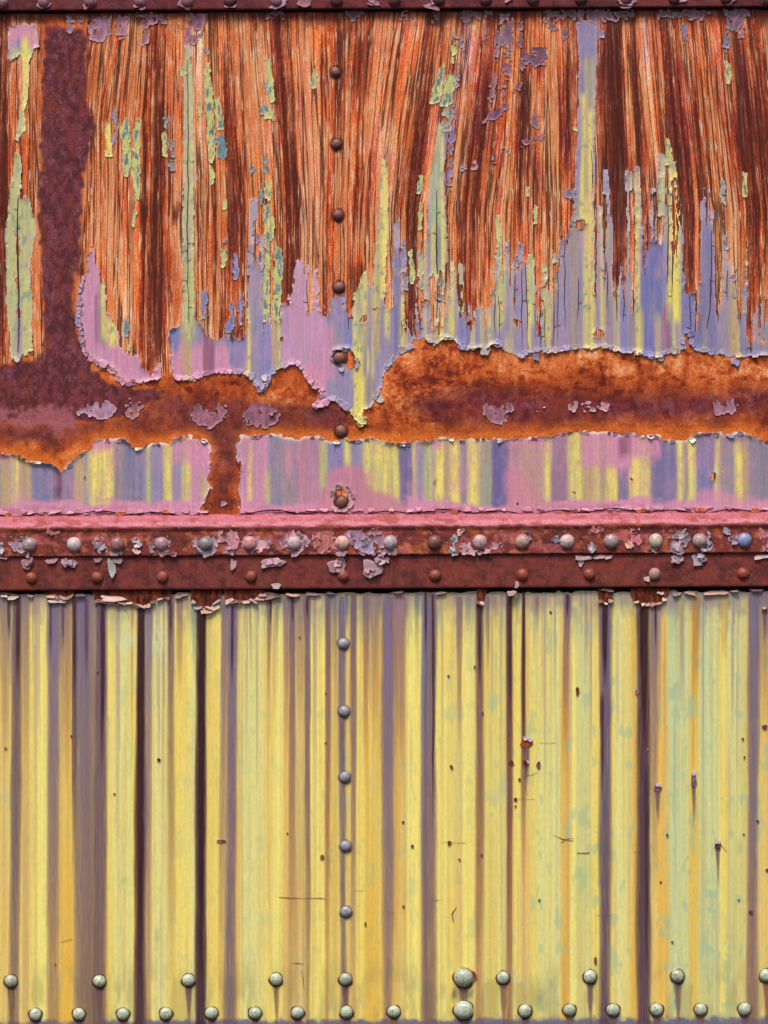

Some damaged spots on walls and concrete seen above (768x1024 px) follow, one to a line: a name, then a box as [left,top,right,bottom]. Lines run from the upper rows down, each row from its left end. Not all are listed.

rust [38,13,94,372]
peeling [0,0,768,514]
peeling [192,529,397,579]
peeling [449,528,503,556]
peeling [575,526,612,567]
peeling [625,528,738,566]
peeling [754,528,768,560]
peeling [0,535,335,614]
peeling [475,588,487,606]
peeling [597,587,615,605]
peeling [630,577,764,607]